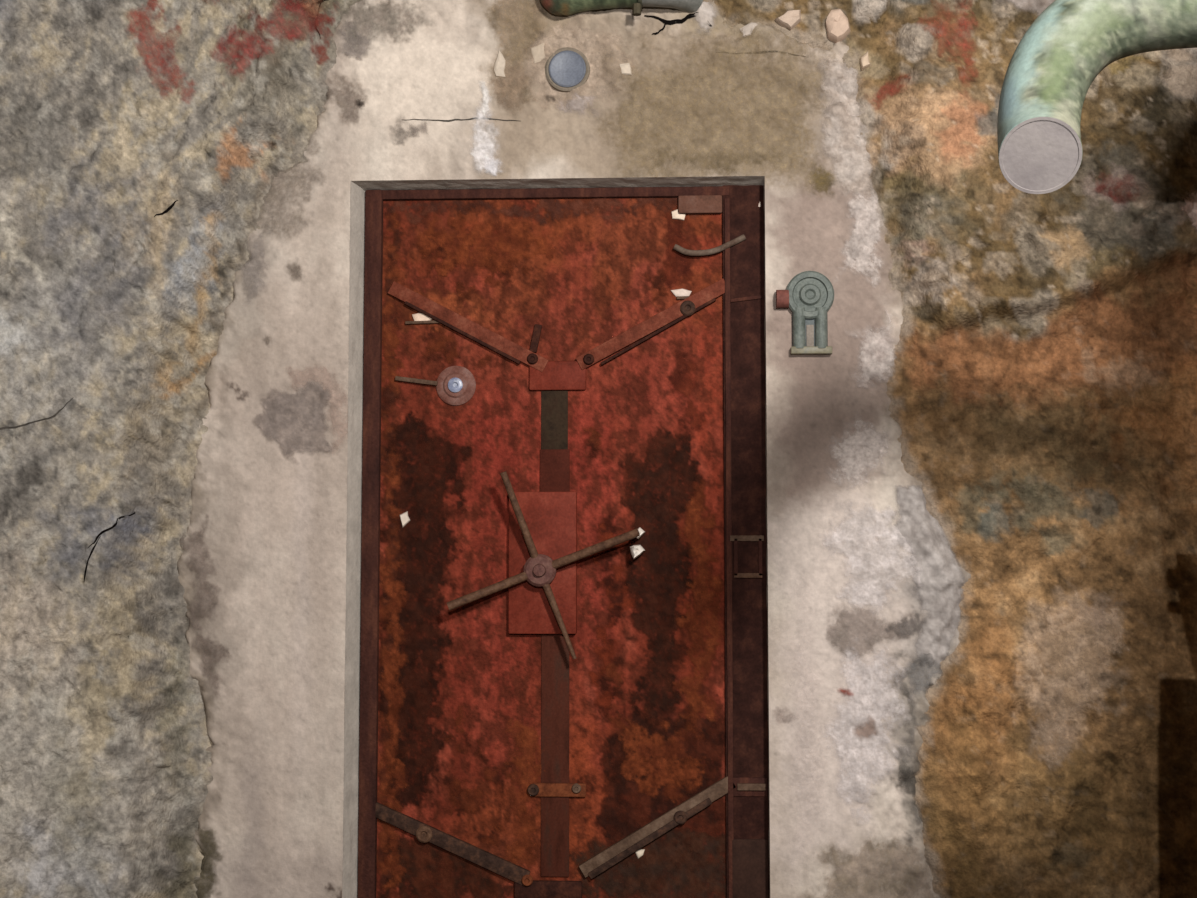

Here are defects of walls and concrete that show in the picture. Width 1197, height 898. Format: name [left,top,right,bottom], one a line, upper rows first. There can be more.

rust [129,0,193,95]
rust [215,0,334,73]
crack [305,0,327,39]
leakage [473,0,544,175]
crack [644,12,806,57]
rust [645,214,693,300]
crack [0,397,74,430]
crack [84,512,136,582]
rust [377,214,472,894]
rust [569,353,726,898]
leakage [825,507,942,823]